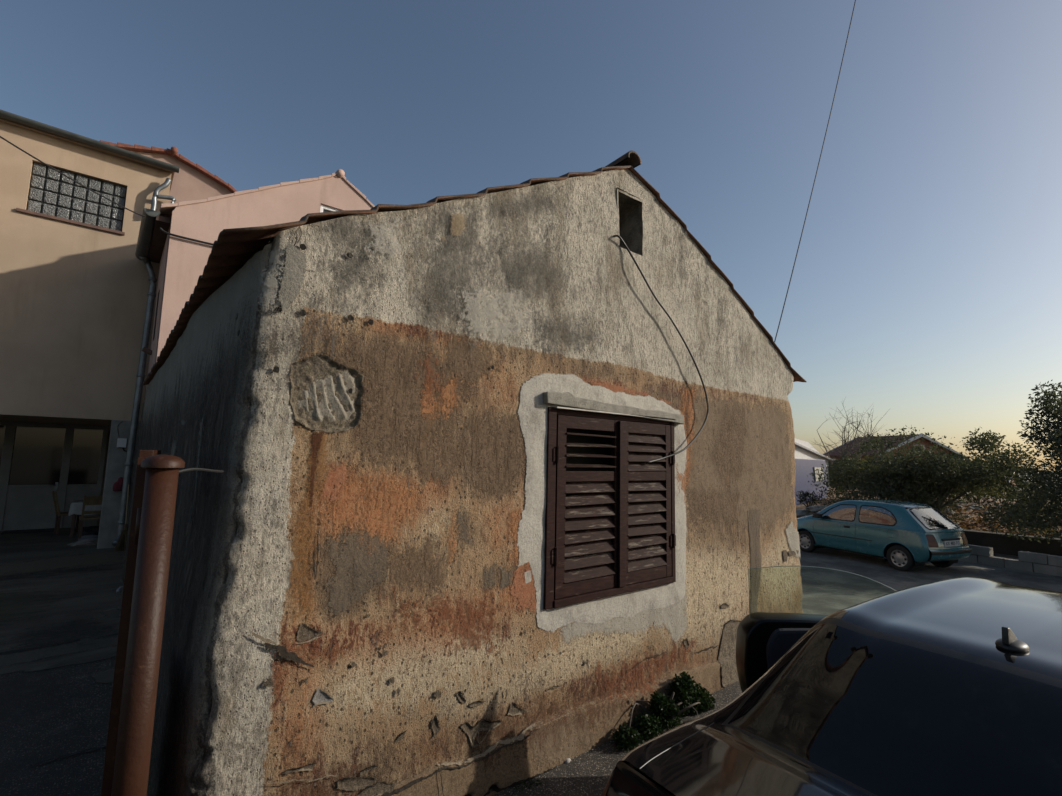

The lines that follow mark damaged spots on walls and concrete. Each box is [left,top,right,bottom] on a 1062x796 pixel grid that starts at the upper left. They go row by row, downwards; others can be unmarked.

leakage [413,184,603,405]
spalling [289,353,364,434]
leakage [0,213,386,796]
spalling [251,623,335,707]
spalling [683,603,741,687]
crack [270,774,337,784]
spalling [430,715,441,740]
crack [382,723,538,796]
spalling [456,689,529,748]
crack [484,768,555,796]